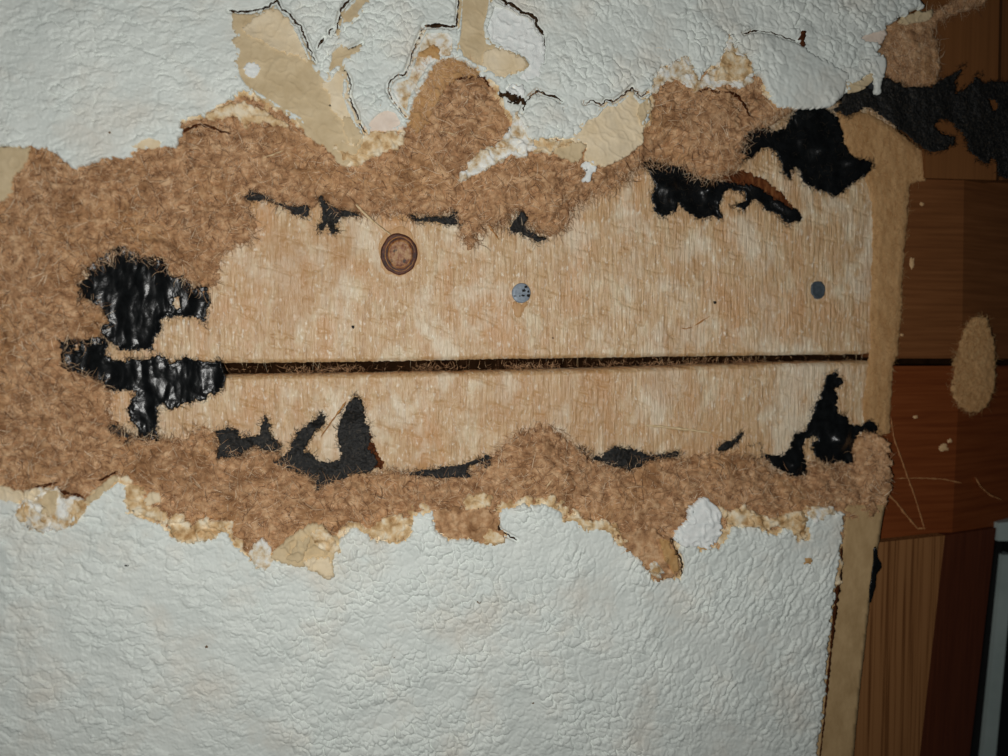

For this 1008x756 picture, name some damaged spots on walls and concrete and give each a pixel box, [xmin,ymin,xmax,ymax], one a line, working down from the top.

crack [229,0,366,133]
peeling [205,5,408,174]
crack [388,0,460,115]
peeling [387,0,653,186]
crack [501,0,545,60]
crack [522,90,563,111]
crack [587,87,647,106]
peeling [0,146,31,202]
peeling [0,475,230,544]
peeling [247,537,274,571]
spalling [303,510,414,580]
spalling [718,499,839,542]